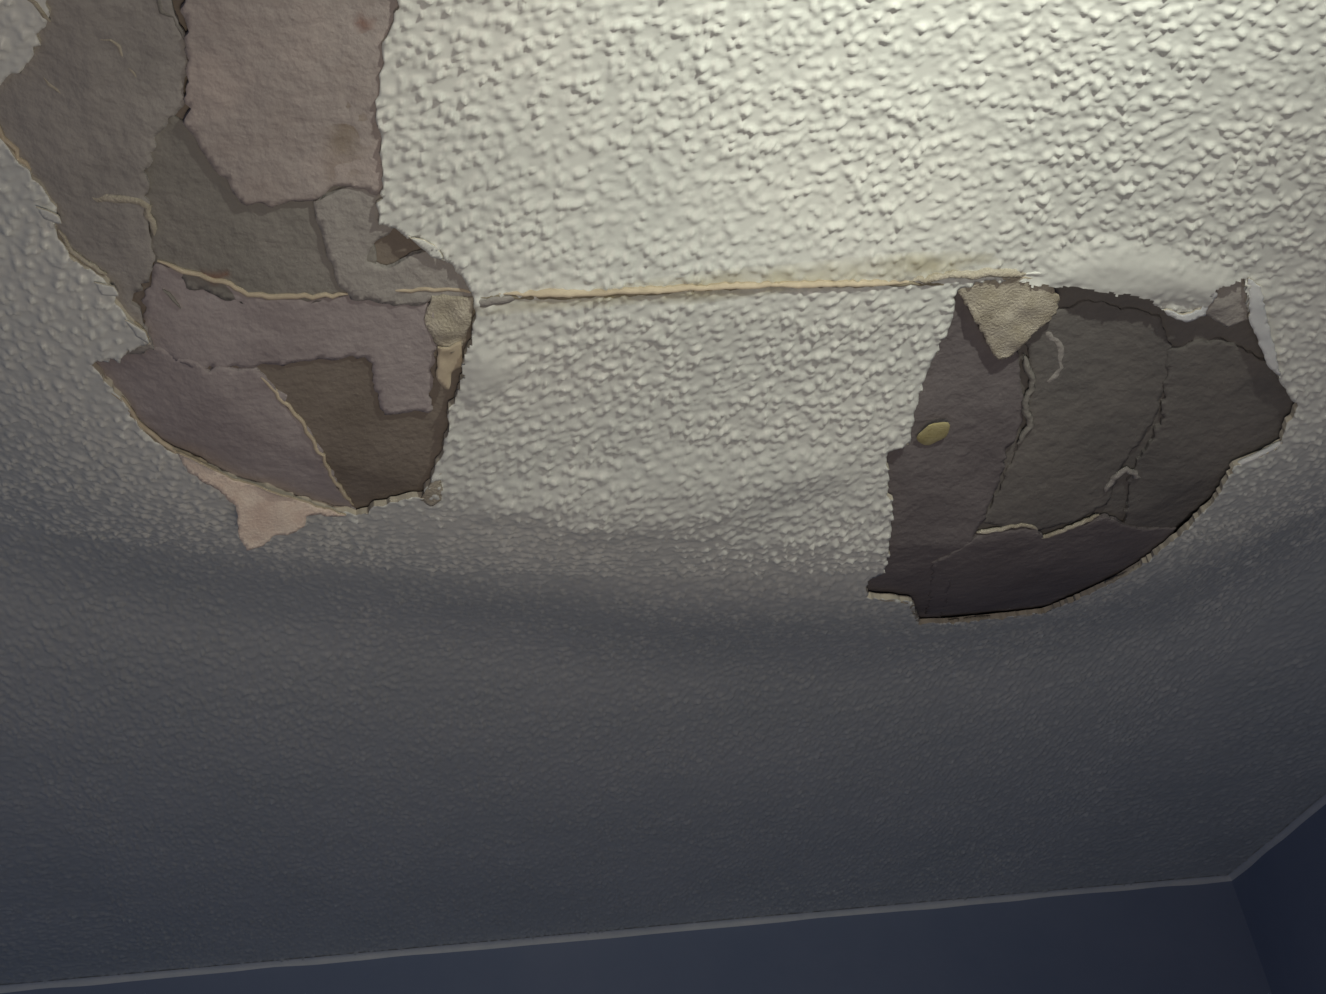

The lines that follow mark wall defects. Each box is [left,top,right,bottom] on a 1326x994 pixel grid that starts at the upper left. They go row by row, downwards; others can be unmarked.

peeling [0,0,476,551]
crack [473,268,1048,308]
peeling [866,277,1295,622]